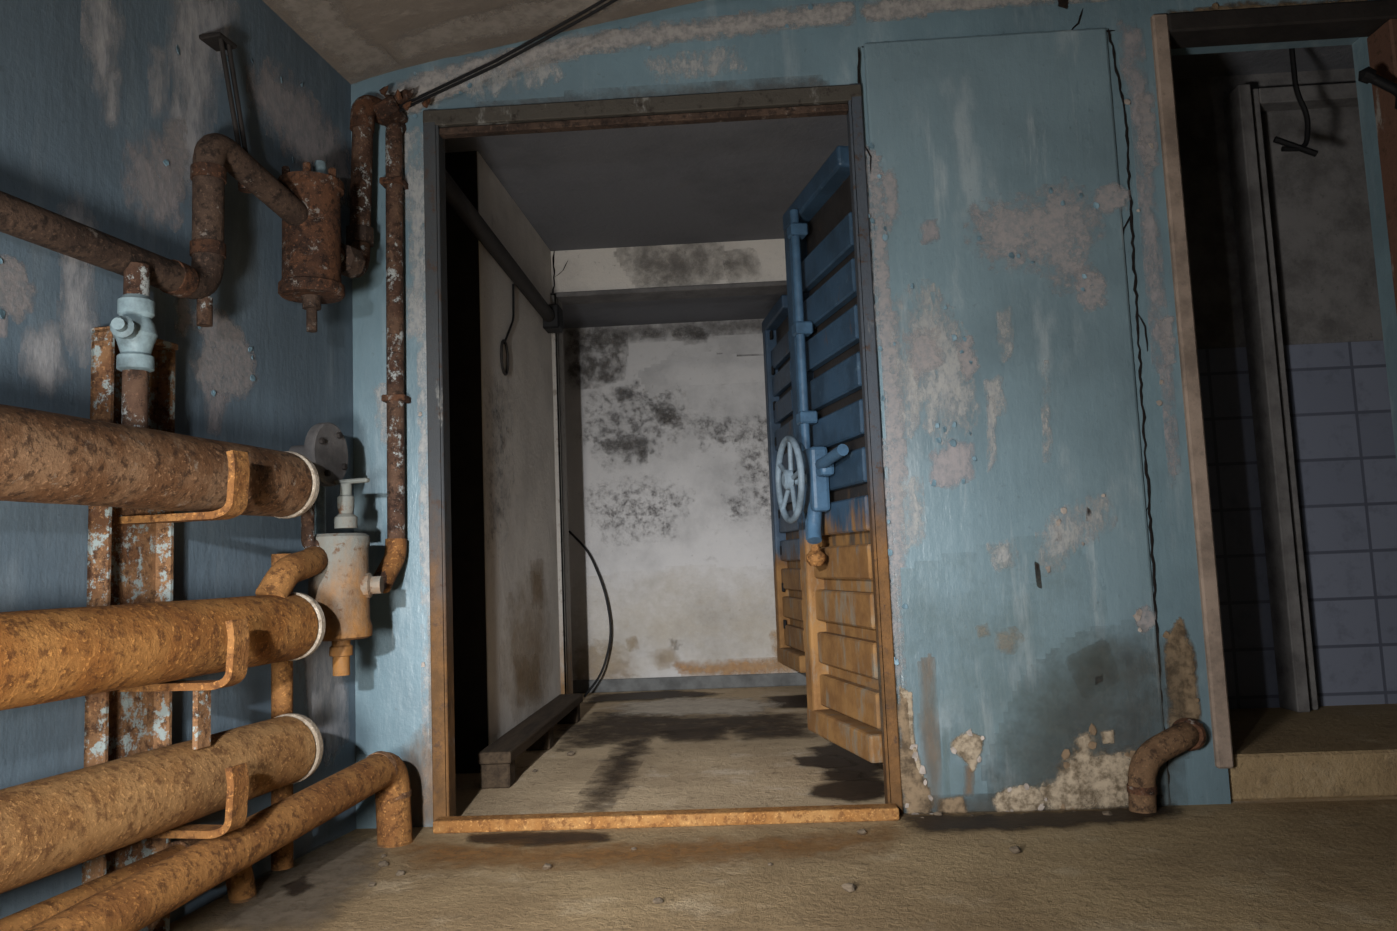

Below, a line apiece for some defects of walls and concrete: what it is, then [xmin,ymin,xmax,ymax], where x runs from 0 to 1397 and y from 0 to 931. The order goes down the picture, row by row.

peeling [0,255,35,337]
peeling [192,308,256,431]
leakage [565,322,762,461]
peeling [375,0,1107,815]
leakage [596,491,679,529]
leakage [705,419,769,516]
flaking render [1133,606,1203,727]
leakage [558,690,885,809]
flaking render [993,723,1136,812]